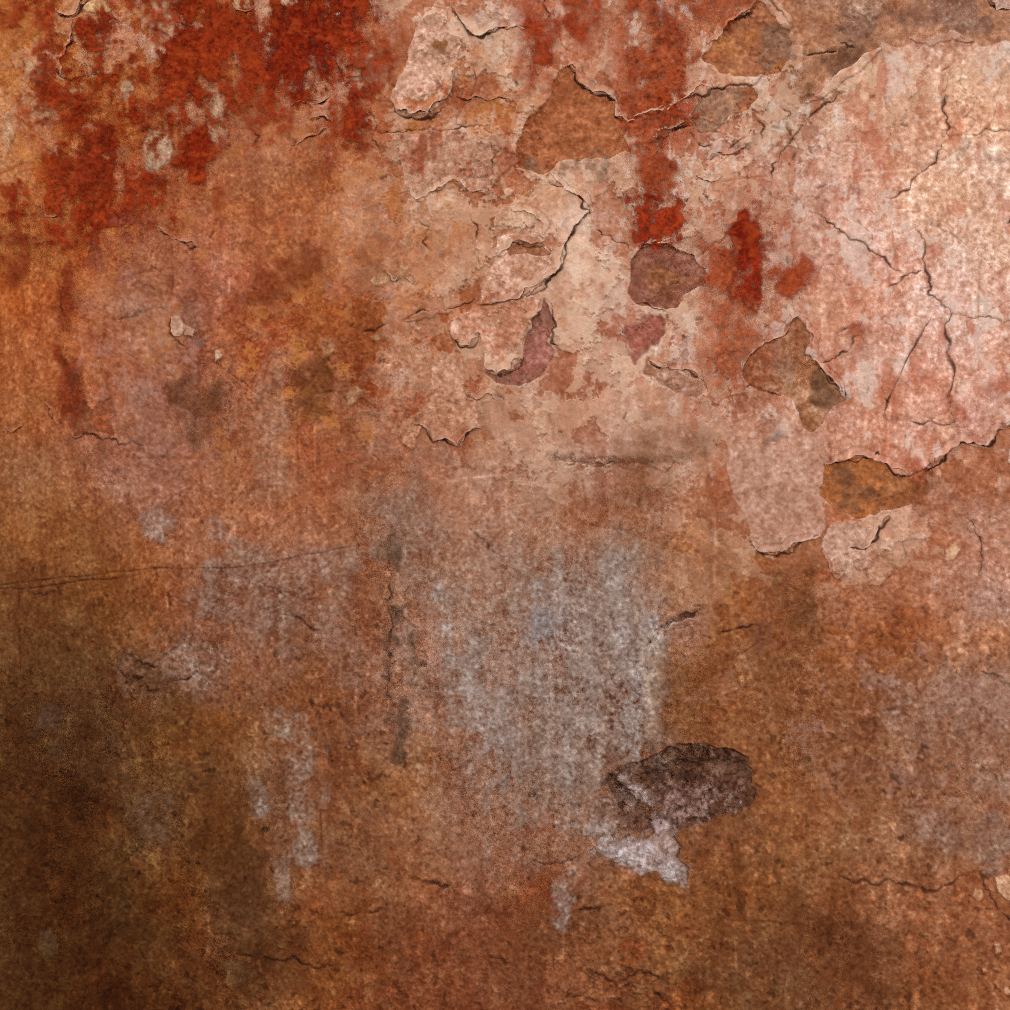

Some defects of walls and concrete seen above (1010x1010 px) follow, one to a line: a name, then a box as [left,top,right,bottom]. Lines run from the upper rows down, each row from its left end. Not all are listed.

corrosion [0,0,394,329]
corrosion [524,0,606,65]
corrosion [617,0,752,252]
peeling [371,0,1010,449]
corrosion [700,192,817,386]
crack [821,216,1005,425]
crack [894,95,950,198]
peeling [750,422,1010,586]
damp [450,636,520,757]
damp [507,546,669,798]
damp [555,884,570,928]
spalling [582,743,756,885]